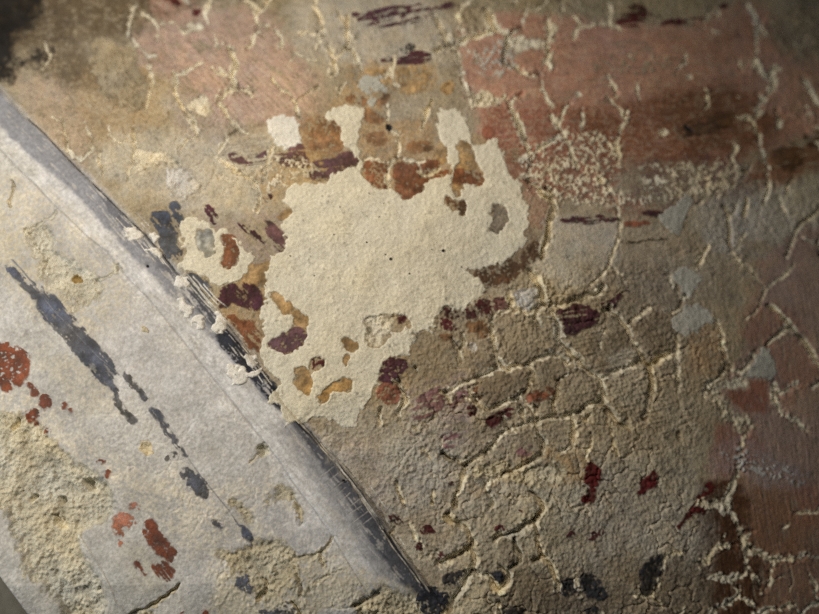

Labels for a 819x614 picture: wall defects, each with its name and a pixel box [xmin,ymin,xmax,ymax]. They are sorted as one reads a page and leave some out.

crack [41,41,52,70]
flaking render [187,95,212,117]
crack [51,0,363,214]
crack [363,54,441,189]
peeling [261,155,320,194]
peeling [518,126,742,211]
crack [386,0,688,614]
crack [633,3,819,614]
crack [376,368,418,425]
flaking render [0,411,114,614]
flaking render [214,537,295,601]
crack [352,595,377,614]